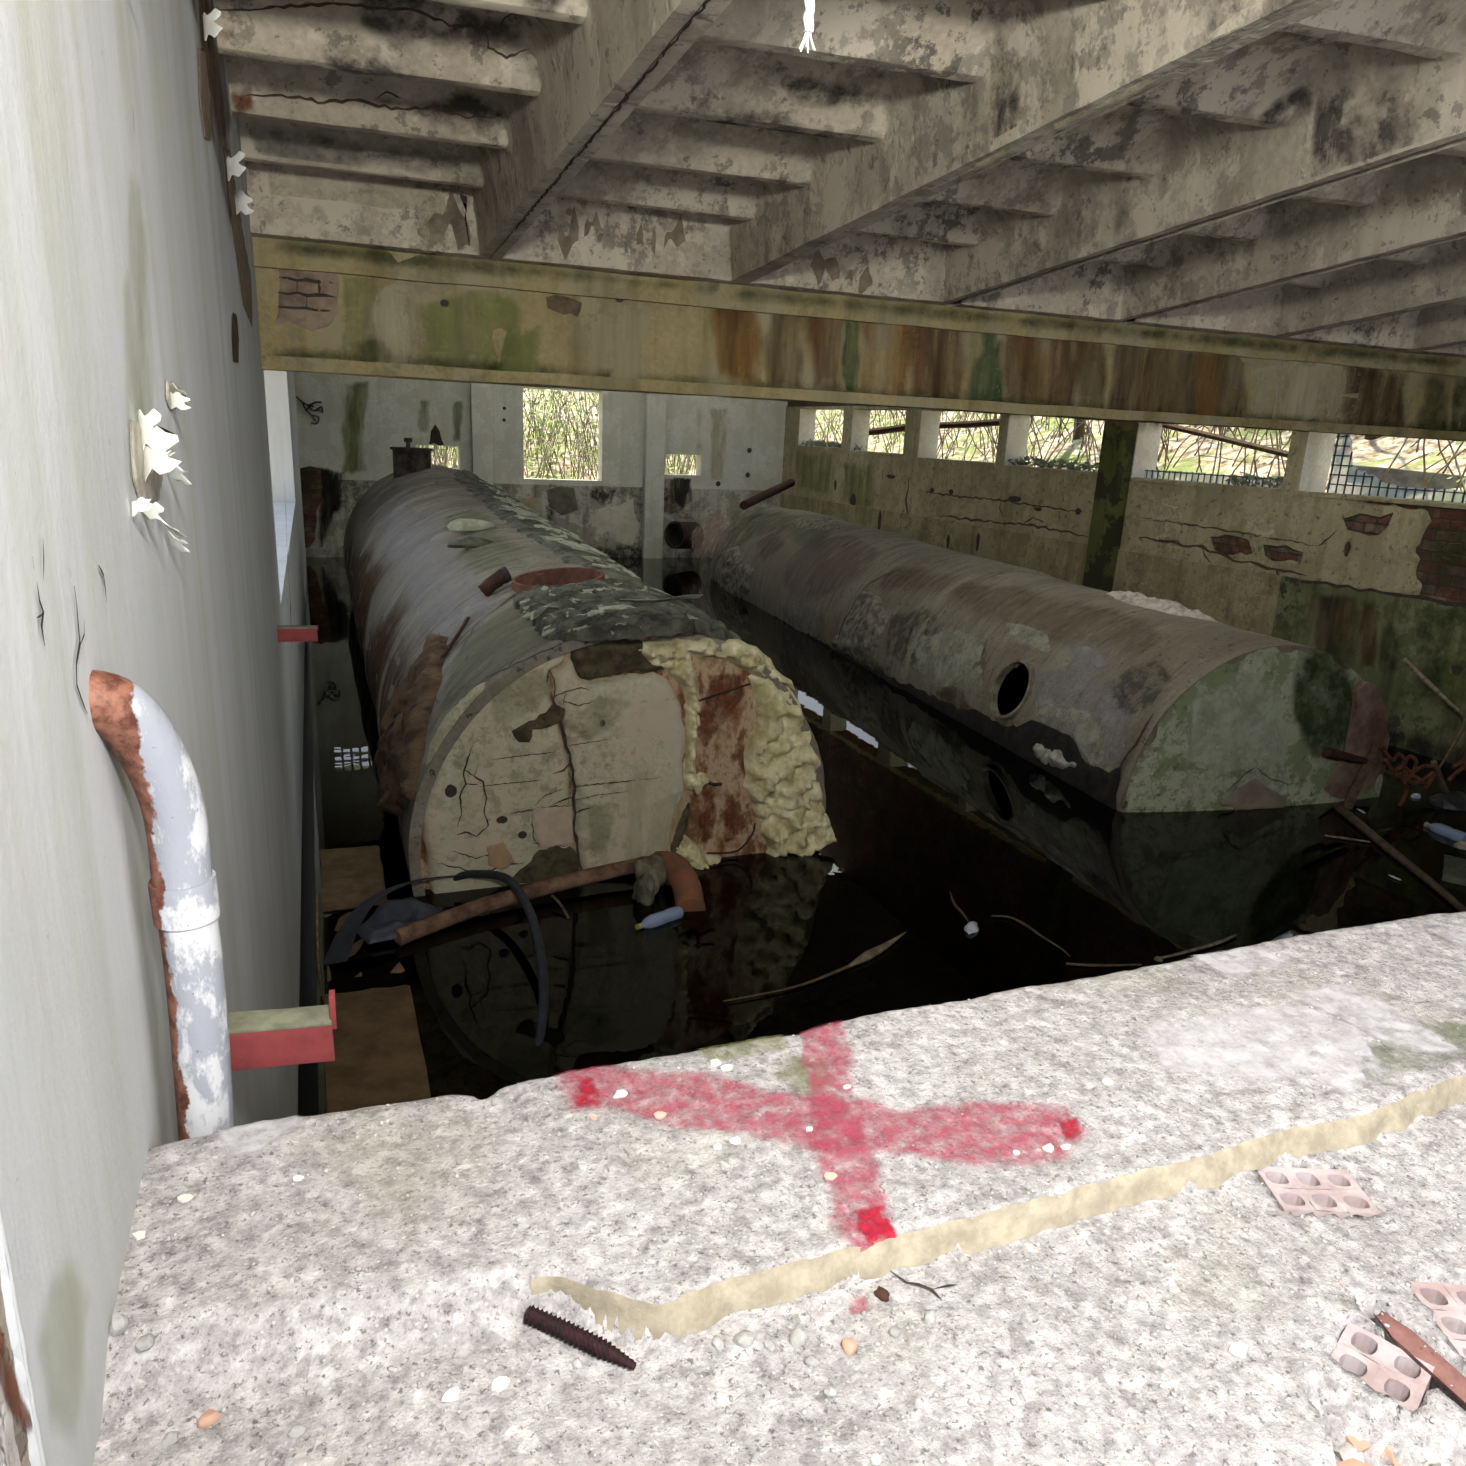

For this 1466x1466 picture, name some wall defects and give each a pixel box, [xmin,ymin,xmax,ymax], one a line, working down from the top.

crack [219,2,547,59]
crack [245,91,495,119]
crack [460,0,711,252]
damp [1264,88,1397,164]
damp [408,296,553,373]
peeling [130,379,192,552]
damp [664,478,692,513]
flaking render [1210,534,1303,563]
flaking render [1343,513,1393,536]
damp [881,568,1169,767]
crack [891,1271,957,1300]
flaking render [0,1204,46,1466]